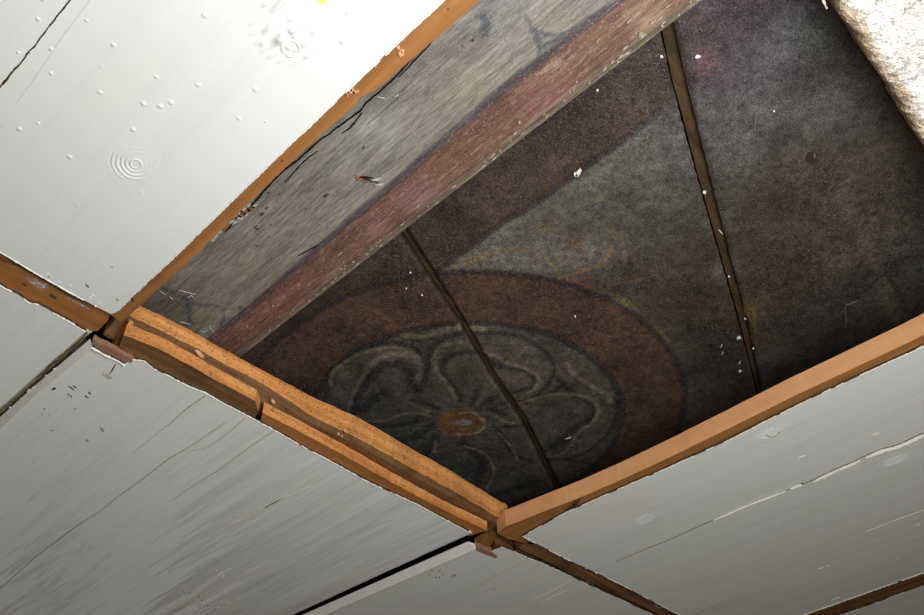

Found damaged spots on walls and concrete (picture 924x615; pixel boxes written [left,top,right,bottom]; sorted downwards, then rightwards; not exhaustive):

crack [0,0,71,88]